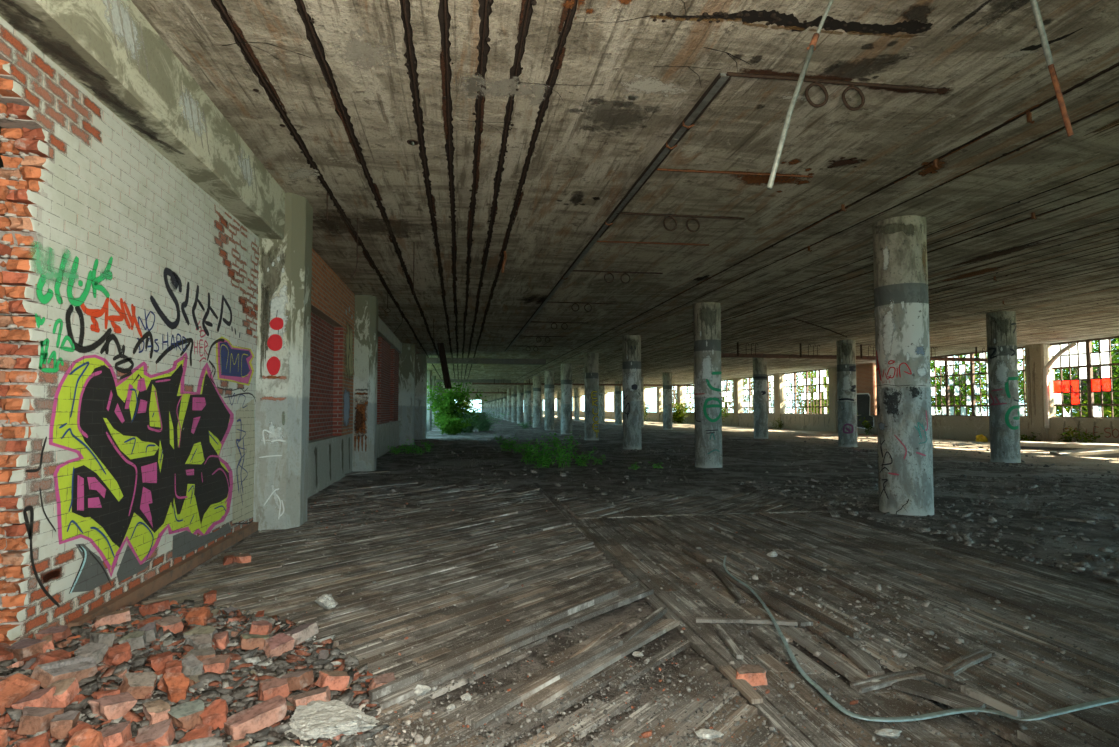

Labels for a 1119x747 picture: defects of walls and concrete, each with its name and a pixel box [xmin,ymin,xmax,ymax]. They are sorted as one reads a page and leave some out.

peeling [0,26,101,160]
spalling [214,0,575,395]
corrosion [657,159,814,193]
crack [619,0,934,88]
corrosion [827,157,866,168]
spalling [874,62,1119,194]
spalling [586,205,853,392]